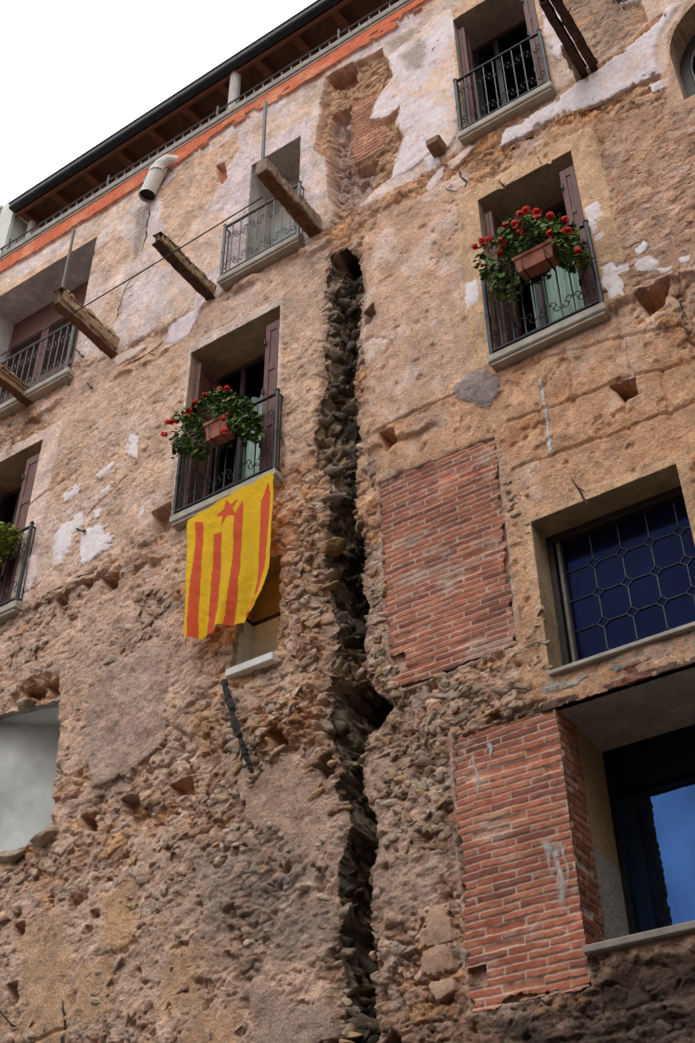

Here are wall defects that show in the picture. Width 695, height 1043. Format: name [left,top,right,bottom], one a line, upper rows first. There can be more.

spalling [313,9,475,222]
peeling [500,0,684,146]
crack [305,249,395,1043]
efflorescence [543,842,569,900]